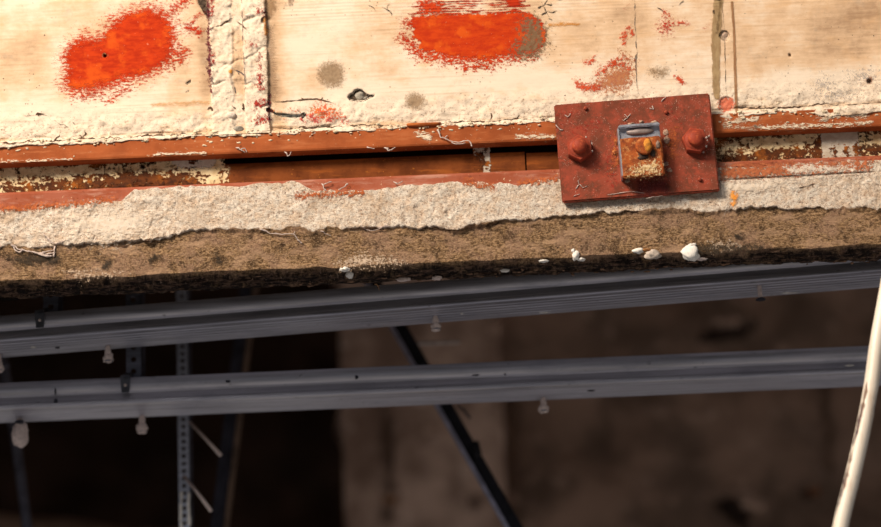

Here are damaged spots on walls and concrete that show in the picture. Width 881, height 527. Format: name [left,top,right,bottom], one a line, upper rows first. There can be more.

leakage [711,0,880,131]
peeling [714,133,823,162]
peeling [857,131,881,156]
peeling [0,159,230,193]